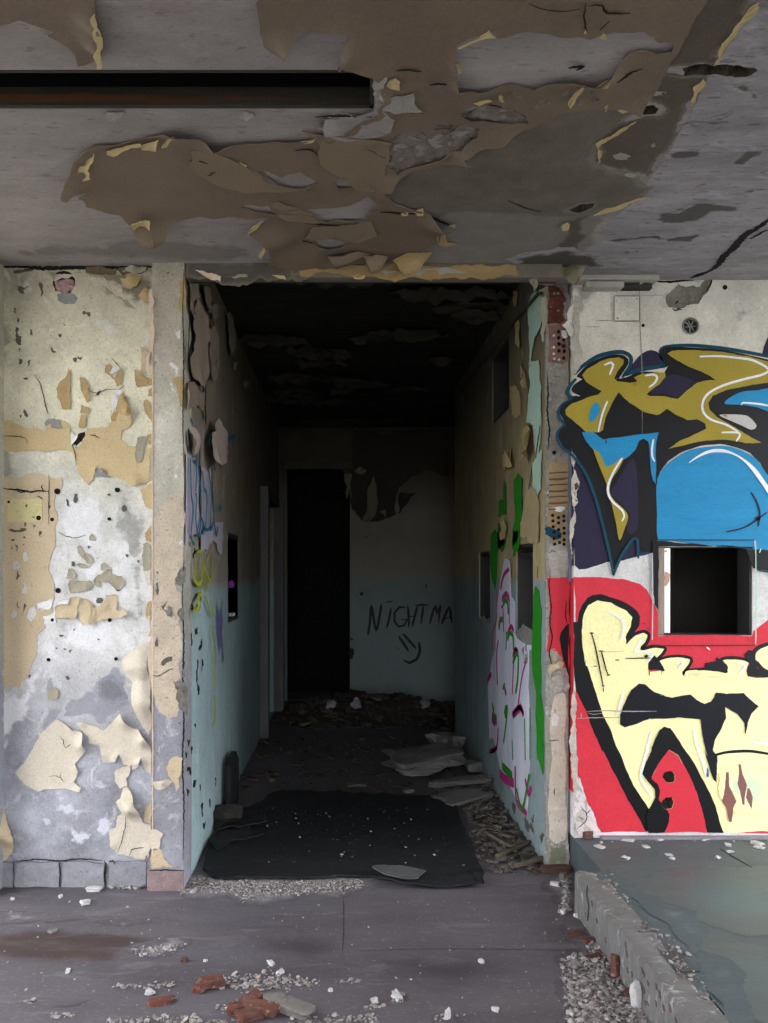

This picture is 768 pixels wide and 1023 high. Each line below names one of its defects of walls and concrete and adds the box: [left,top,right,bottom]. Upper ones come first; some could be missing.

peeling [61,0,768,578]
crack [639,219,768,311]
peeling [4,265,228,869]
peeling [0,807,14,861]
damp [0,911,351,972]
damp [367,946,539,1016]